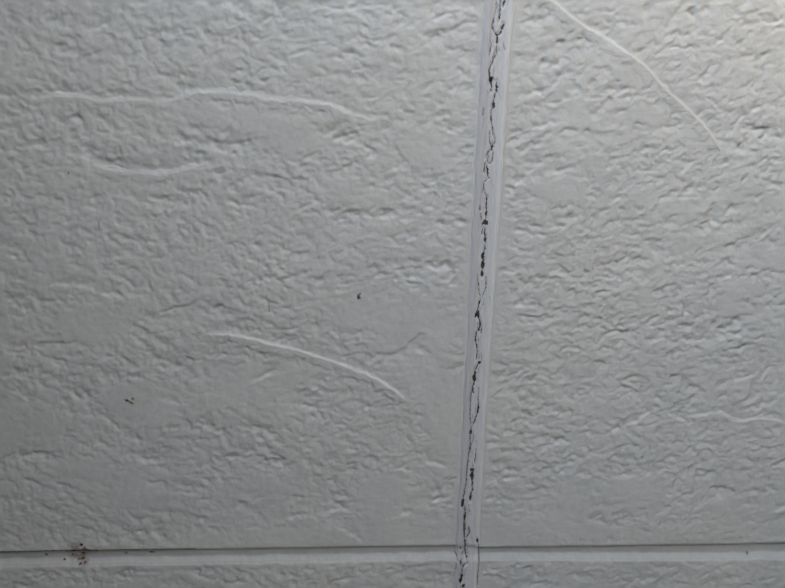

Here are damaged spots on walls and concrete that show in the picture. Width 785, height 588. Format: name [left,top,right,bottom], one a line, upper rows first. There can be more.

crack [455,0,508,587]